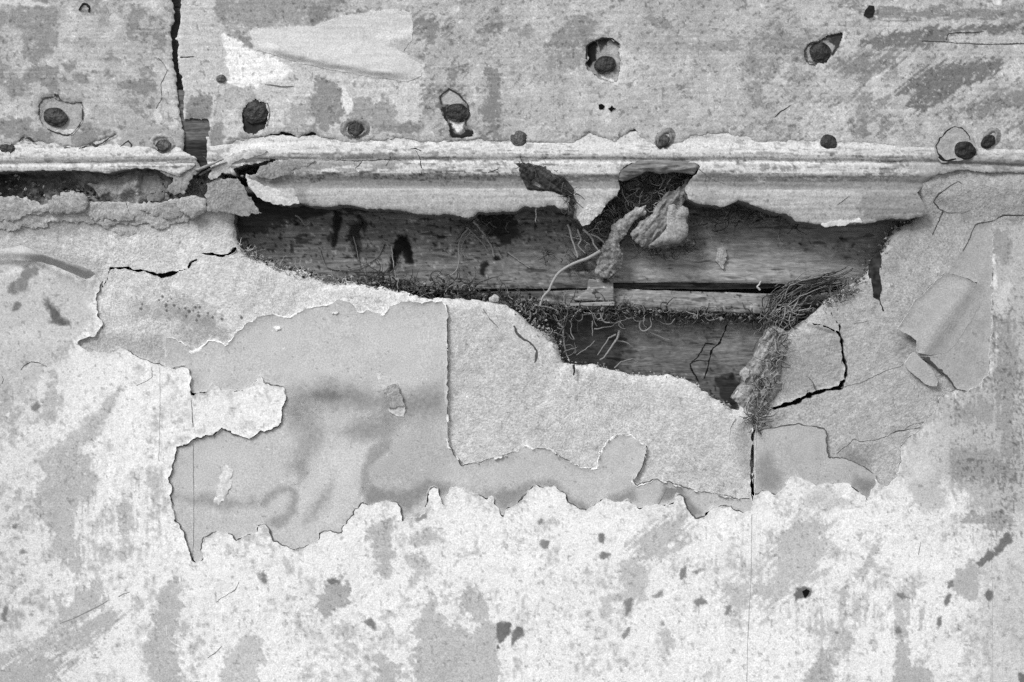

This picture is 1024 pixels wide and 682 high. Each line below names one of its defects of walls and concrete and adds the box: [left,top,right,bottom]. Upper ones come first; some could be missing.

crack [101,248,237,285]
peeling [0,124,1024,562]
crack [729,321,901,660]
crack [932,181,970,235]